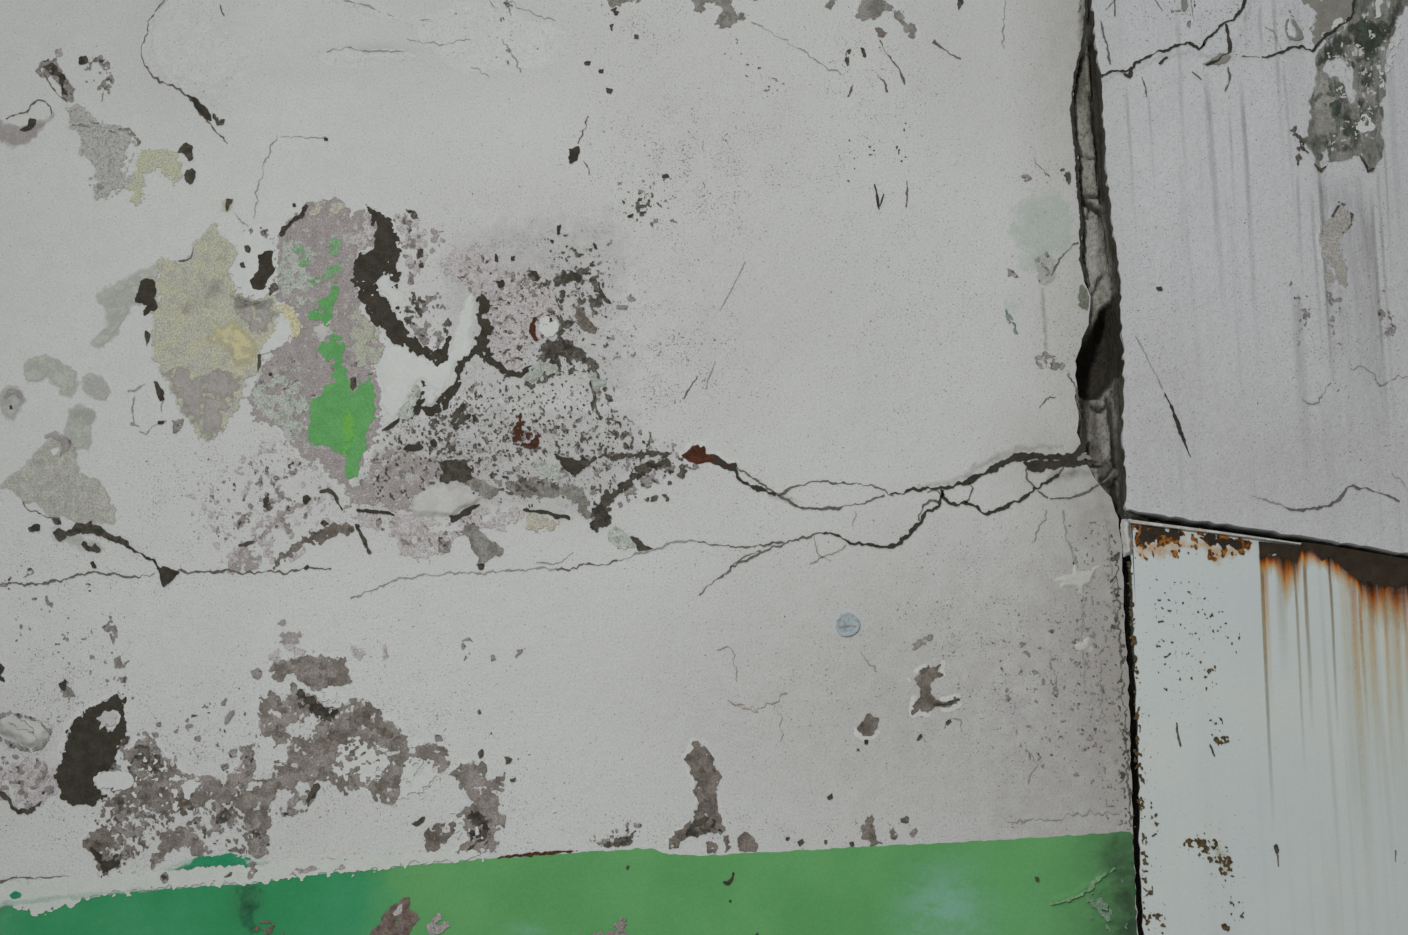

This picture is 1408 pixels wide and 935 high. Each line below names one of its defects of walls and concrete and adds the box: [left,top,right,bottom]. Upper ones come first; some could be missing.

peeling [35,48,196,206]
peeling [689,0,961,98]
crack [1021,0,1356,310]
peeling [1290,0,1408,173]
peeling [93,136,741,575]
crack [1302,366,1408,405]
crack [0,518,331,587]
crack [350,375,1136,830]
crack [1251,473,1408,512]
peeling [0,624,642,884]
peeling [666,737,758,853]
rust [1127,521,1408,934]